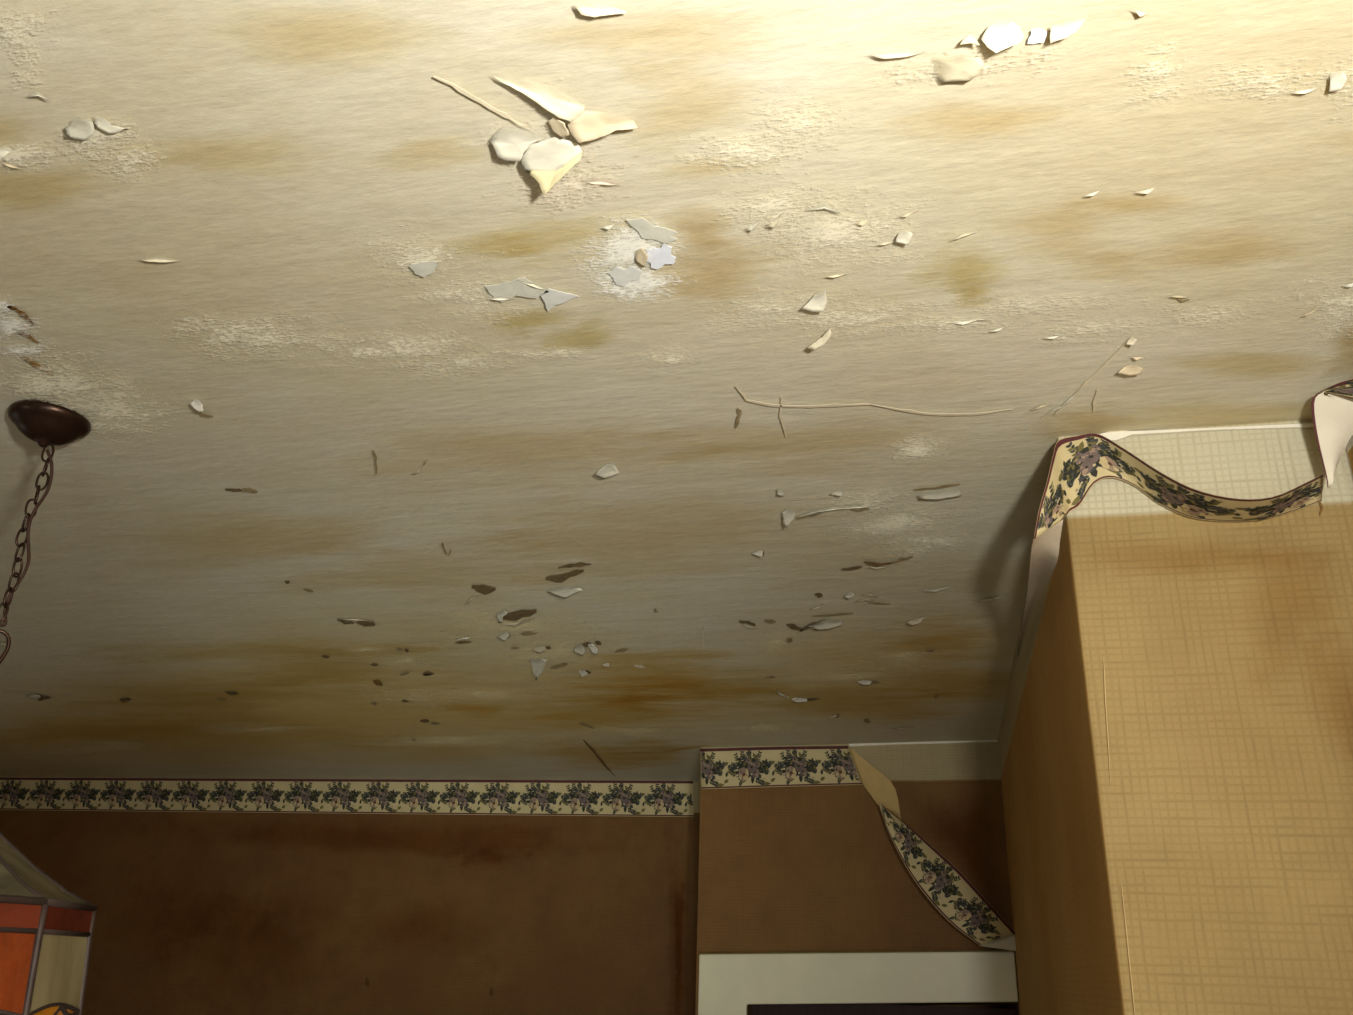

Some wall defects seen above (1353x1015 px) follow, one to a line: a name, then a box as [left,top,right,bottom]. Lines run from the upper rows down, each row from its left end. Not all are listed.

peeling [940,19,1086,83]
peeling [65,118,129,141]
peeling [490,76,638,196]
flaking render [603,218,678,287]
flaking render [484,277,579,311]
peeling [467,585,496,604]
peeling [496,609,628,680]
peeling [546,562,591,599]
peeling [739,592,890,643]
peeling [848,746,901,819]